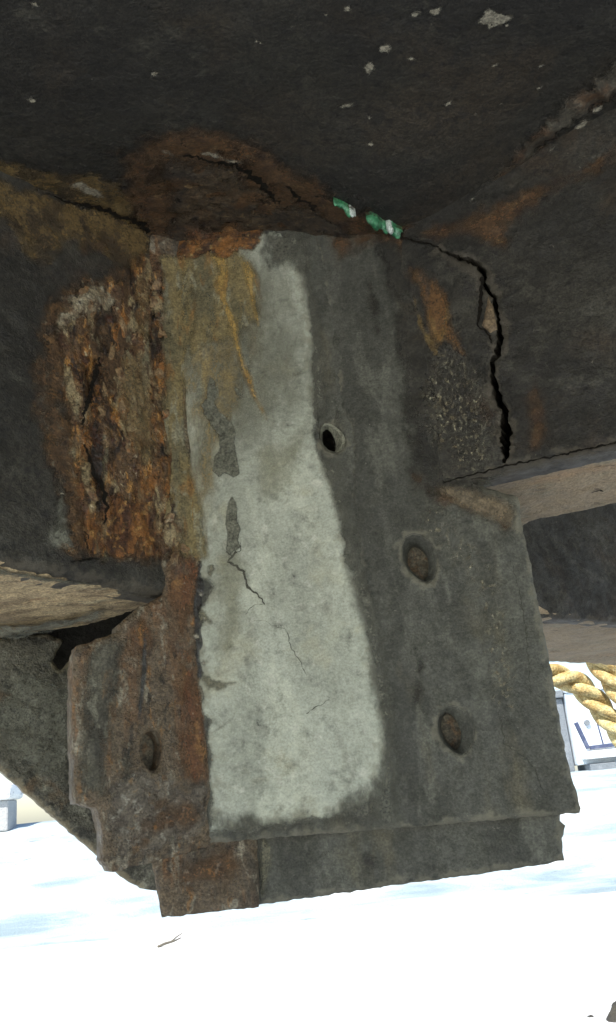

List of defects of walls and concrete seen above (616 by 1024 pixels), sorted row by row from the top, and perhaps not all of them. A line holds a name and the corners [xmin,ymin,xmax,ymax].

crack [36,189,151,234]
rust [0,128,413,781]
rust [412,269,461,352]
crack [400,232,616,483]